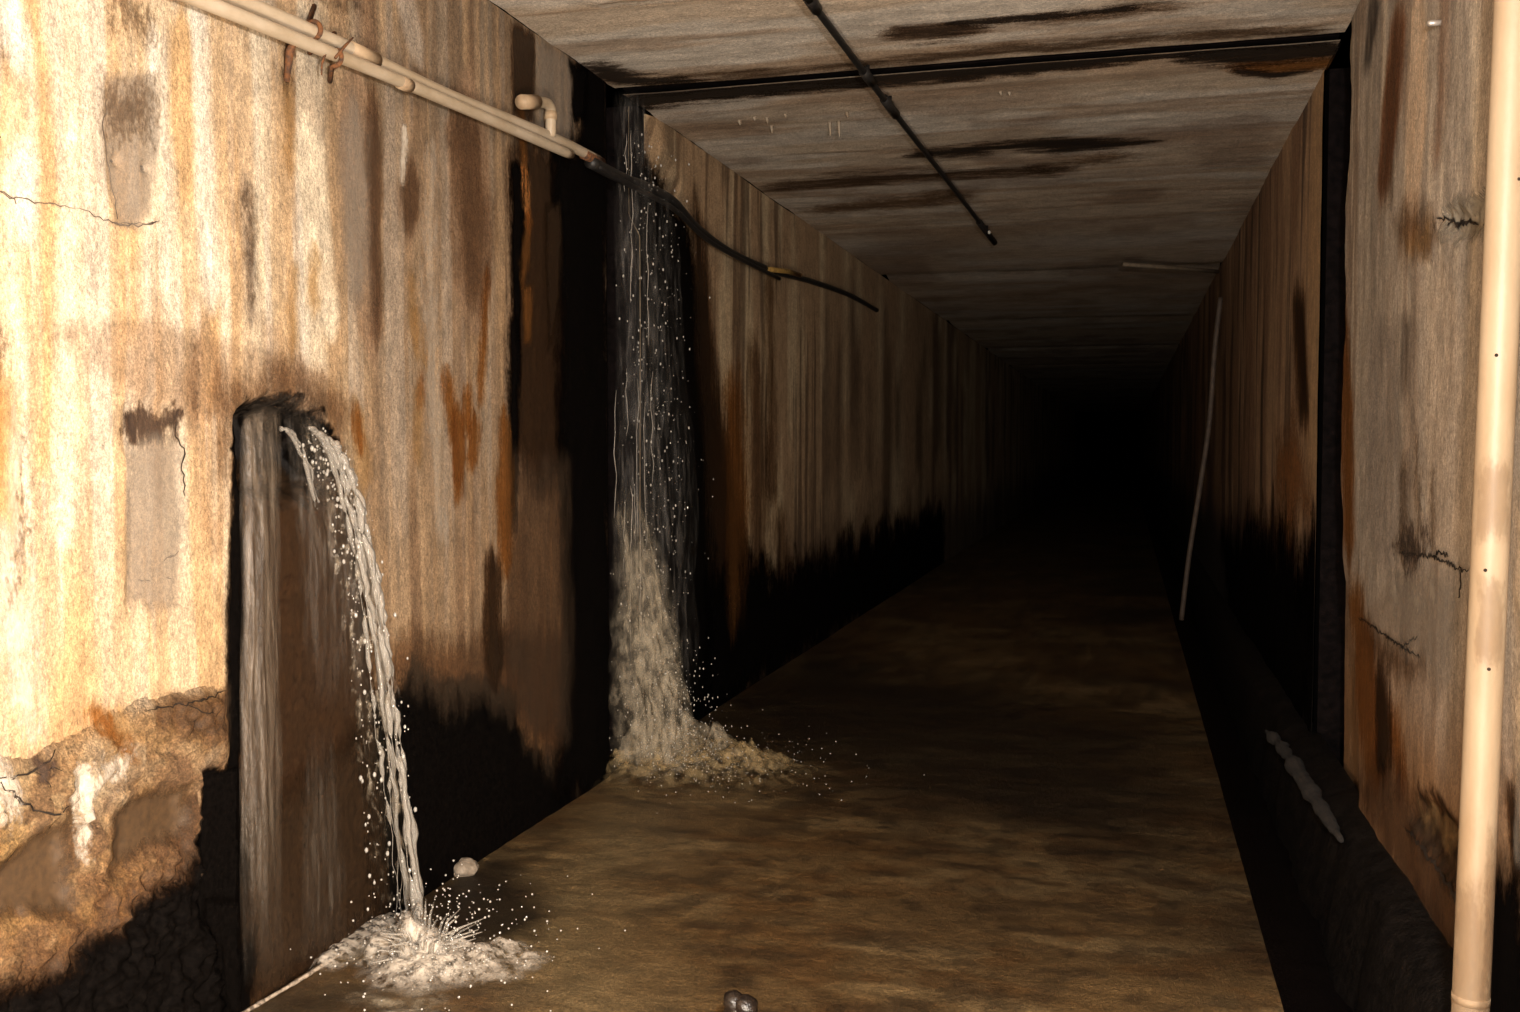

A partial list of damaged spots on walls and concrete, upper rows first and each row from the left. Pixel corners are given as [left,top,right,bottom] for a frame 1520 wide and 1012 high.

water stain [947,6,1136,25]
water stain [511,26,535,120]
water stain [569,41,1340,164]
crack [0,191,152,224]
water stain [629,130,945,755]
water stain [0,144,610,1012]
crack [1400,549,1468,598]
crack [1359,617,1420,658]
crack [146,690,226,714]
crack [0,749,69,816]
spalling [0,816,76,917]
spalling [109,786,191,875]